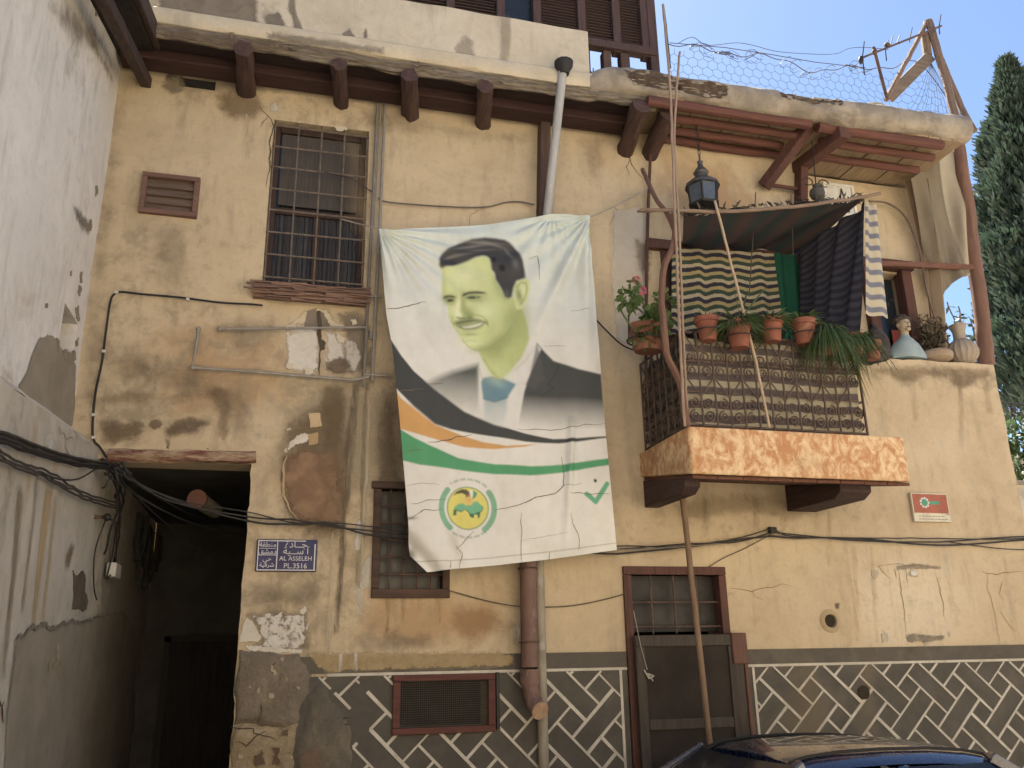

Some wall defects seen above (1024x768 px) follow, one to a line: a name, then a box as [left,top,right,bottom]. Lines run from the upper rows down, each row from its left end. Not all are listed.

spalling [625,69,728,99]
peeling [70,270,83,322]
flaking render [56,337,79,365]
peeling [285,308,370,375]
leakage [103,418,206,447]
flaking render [66,545,88,612]
flaking render [230,606,513,768]